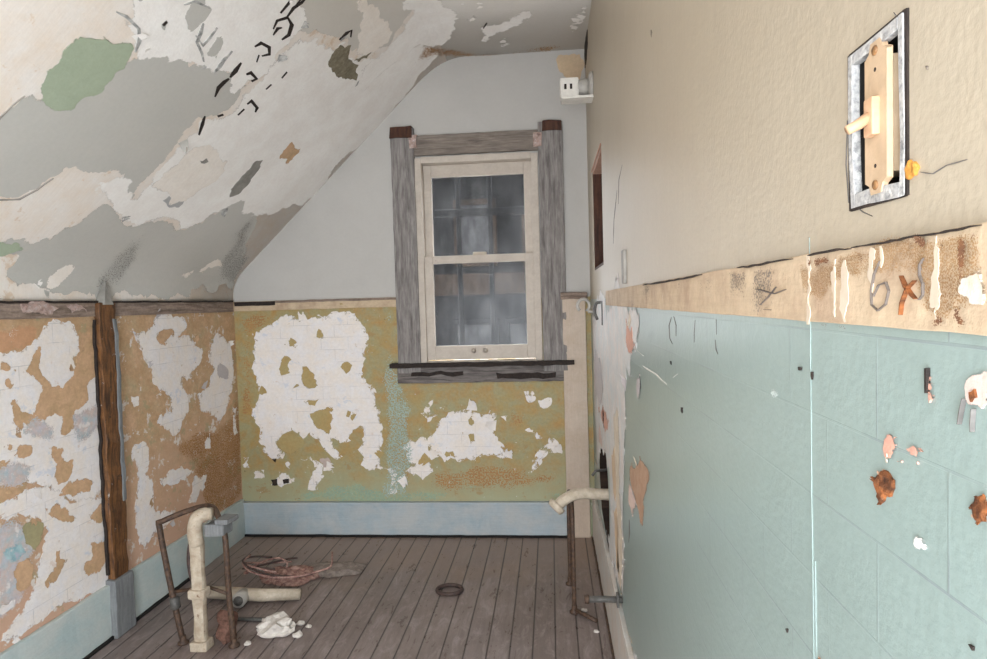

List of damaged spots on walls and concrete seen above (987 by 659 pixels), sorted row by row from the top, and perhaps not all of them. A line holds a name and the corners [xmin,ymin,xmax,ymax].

peeling [0,0,532,644]
peeling [524,391,552,409]
peeling [525,428,563,473]
peeling [592,289,640,595]
spalling [870,434,924,505]
spalling [968,494,987,525]